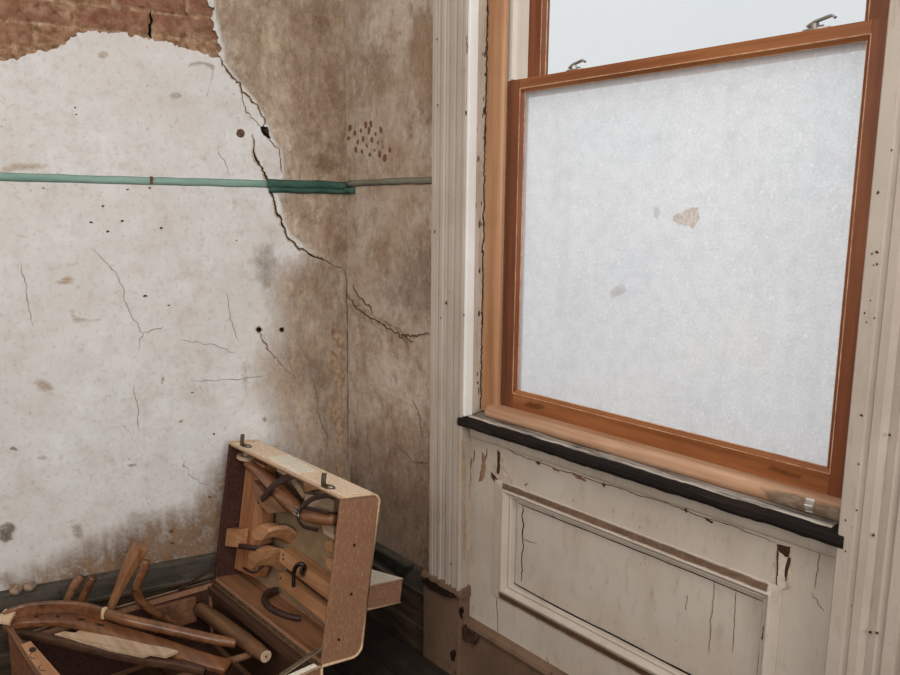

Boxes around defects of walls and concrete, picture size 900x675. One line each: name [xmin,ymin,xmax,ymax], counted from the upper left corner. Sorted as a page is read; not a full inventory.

spalling [0,0,222,69]
rust [347,121,391,162]
crack [95,251,163,346]
crack [194,56,430,453]
damp [0,524,14,542]
damp [9,468,226,588]
crack [496,503,763,675]
peeling [478,446,793,591]